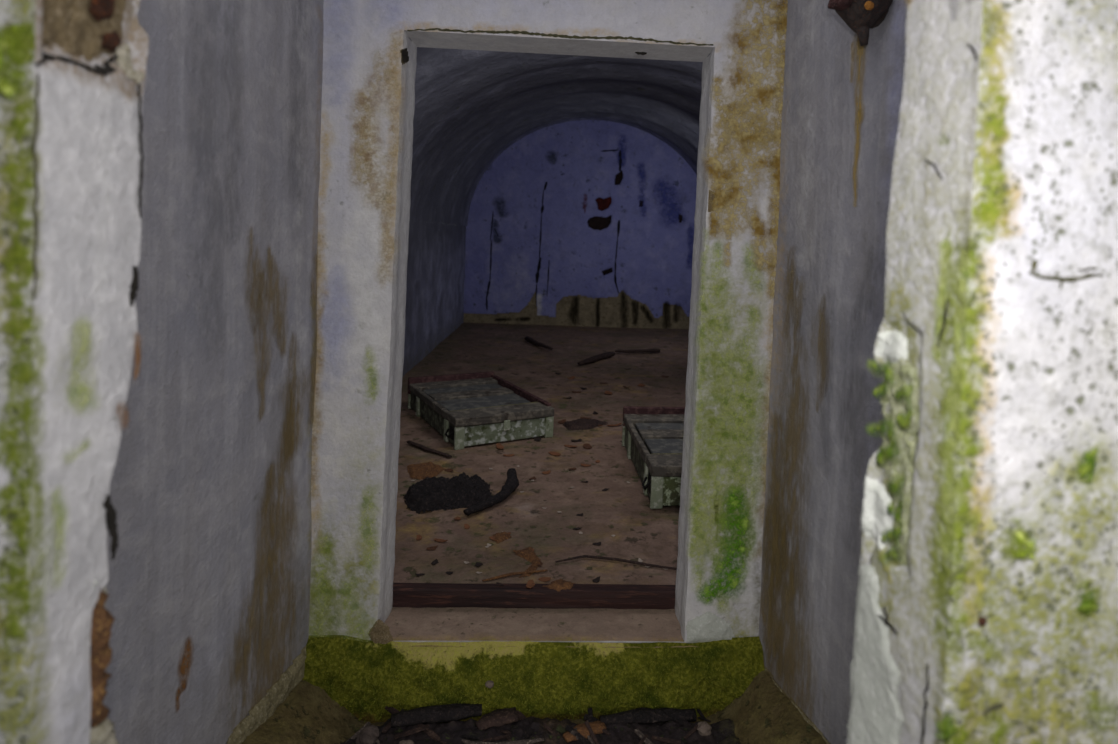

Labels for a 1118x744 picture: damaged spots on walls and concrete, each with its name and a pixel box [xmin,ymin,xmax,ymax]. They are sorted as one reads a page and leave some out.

spalling [42,0,145,84]
rust [851,38,864,201]
flaking render [463,290,690,329]
crack [1030,259,1104,288]
damp [236,234,317,710]
spalling [860,330,920,571]
spalling [89,580,119,744]
flaking render [847,564,905,744]